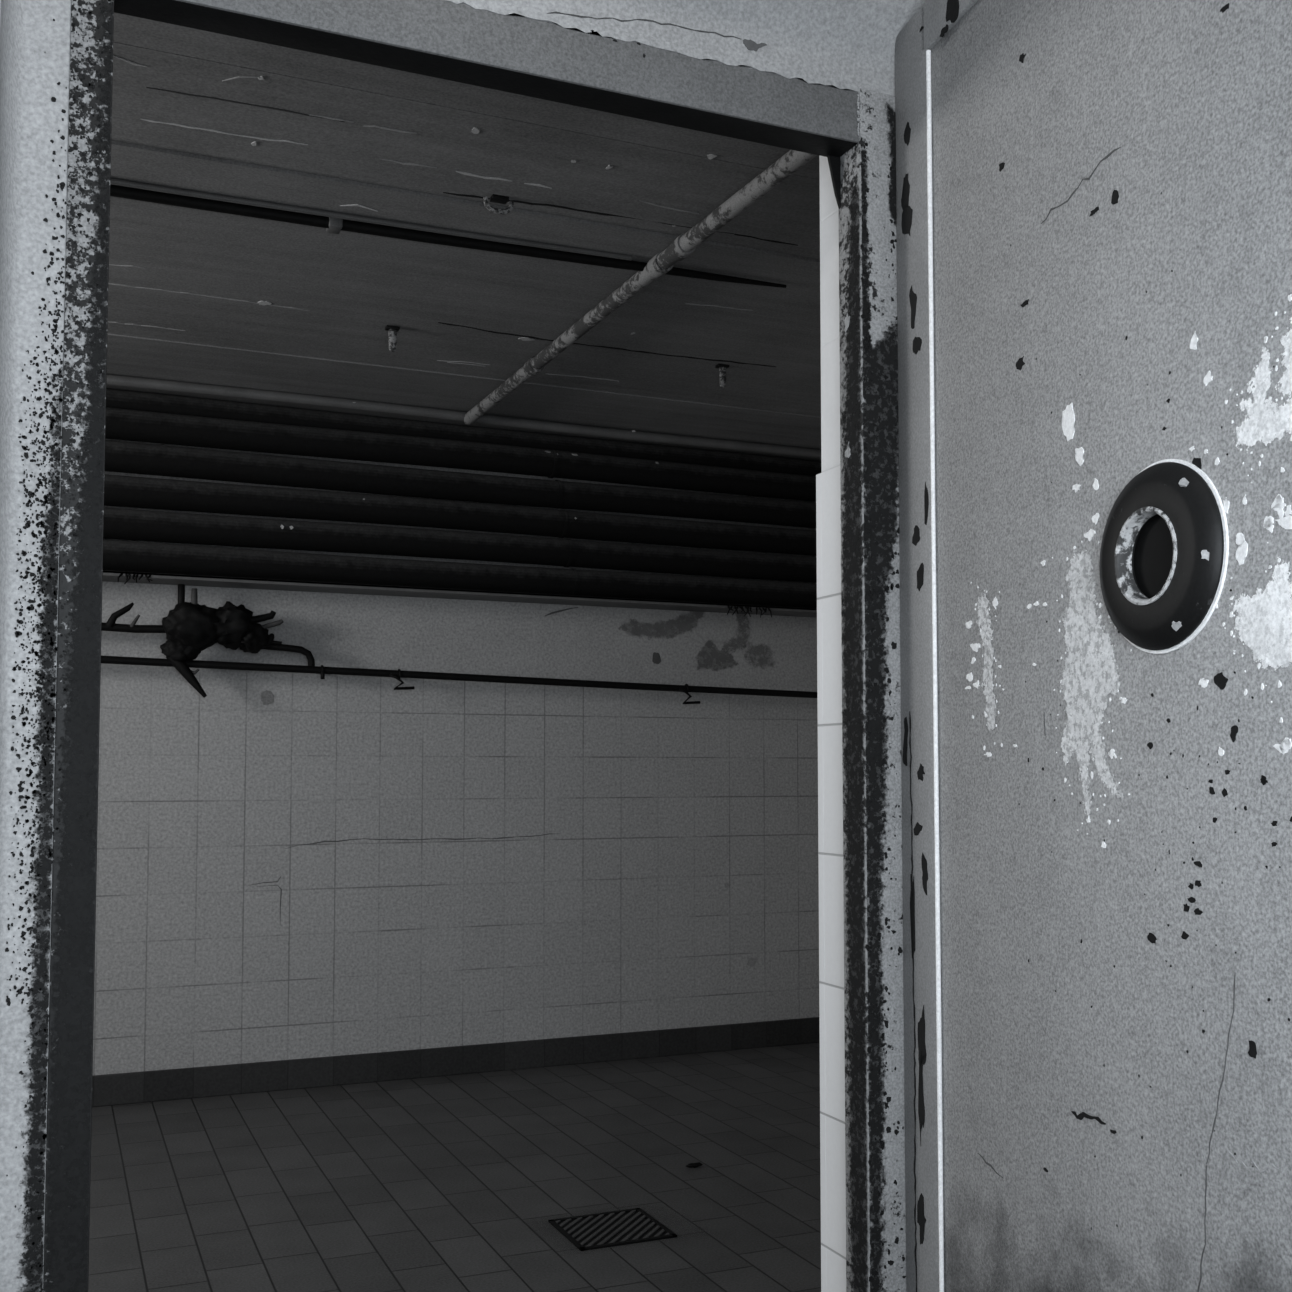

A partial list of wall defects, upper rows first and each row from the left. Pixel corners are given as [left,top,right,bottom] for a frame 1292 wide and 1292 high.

corrosion [886,102,897,277]
peeling [1051,403,1084,466]
peeling [1189,294,1292,513]
peeling [1263,494,1292,543]
corrosion [5,0,113,1292]
corrosion [840,137,906,1292]
peeling [965,582,1017,757]
peeling [1027,513,1132,848]
spalling [1170,719,1247,811]
peeling [1198,533,1292,703]
spalling [1147,817,1217,943]
spalling [1248,1040,1257,1059]